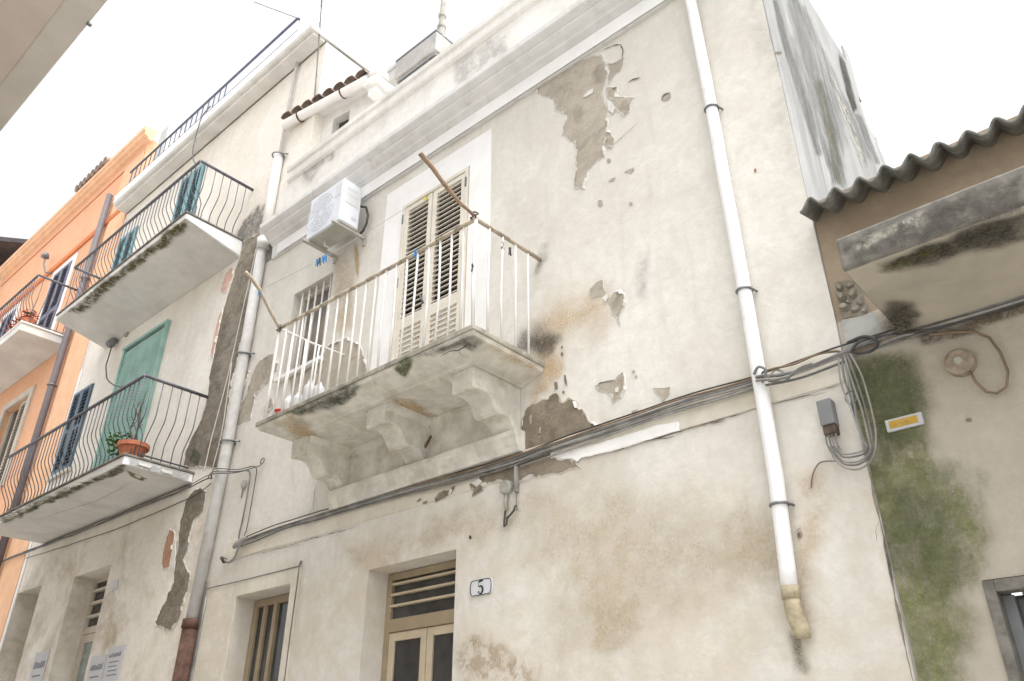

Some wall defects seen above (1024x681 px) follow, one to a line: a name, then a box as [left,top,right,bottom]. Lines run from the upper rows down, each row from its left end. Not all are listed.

peeling [535,44,640,190]
leakage [774,0,880,182]
leakage [844,179,1024,269]
peeling [127,233,279,481]
leakage [523,335,555,353]
peeling [469,375,612,497]
peeling [589,280,627,327]
peeling [595,370,637,404]
peeling [653,387,671,402]
leakage [855,360,924,443]
peeling [416,486,455,504]
peeling [155,486,207,632]